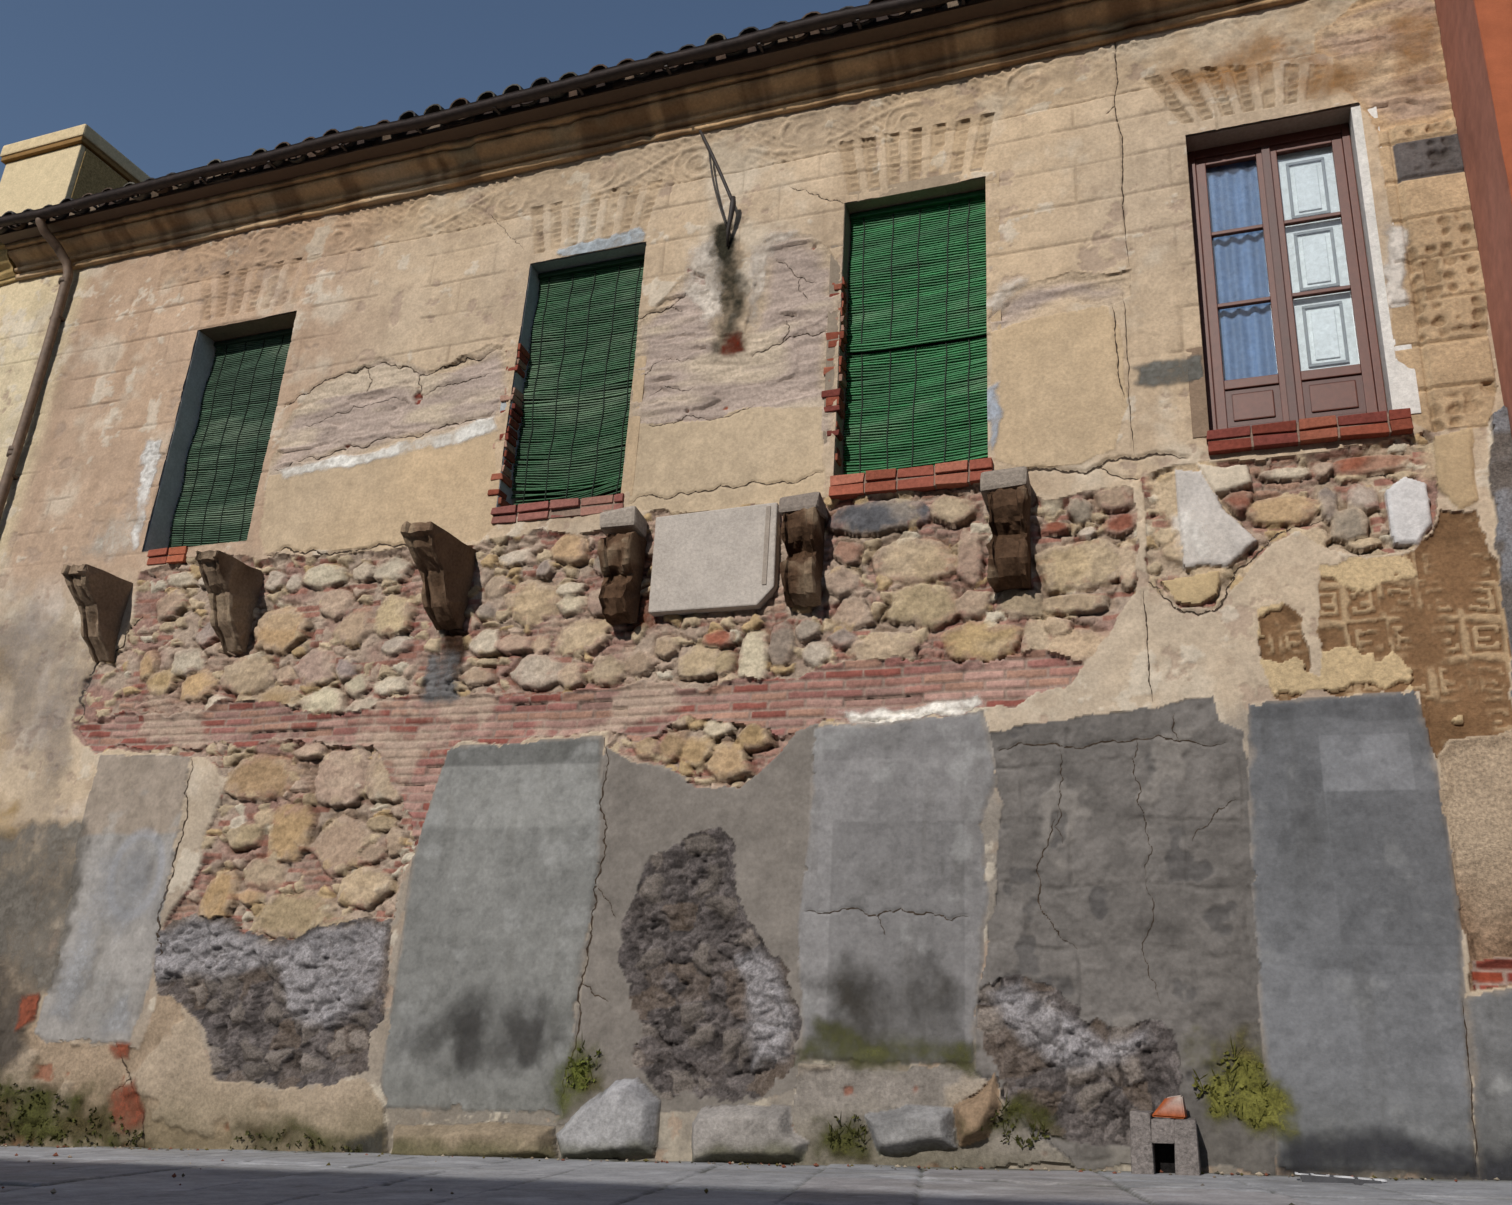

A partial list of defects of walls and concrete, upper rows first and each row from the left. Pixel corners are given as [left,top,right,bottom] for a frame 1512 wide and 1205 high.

spalling [0,232,1184,1169]
damp [685,224,793,351]
crack [808,907,968,934]
damp [986,279,1023,308]
crack [1028,44,1184,480]
crack [1000,520,1323,1003]
spalling [1141,0,1512,990]